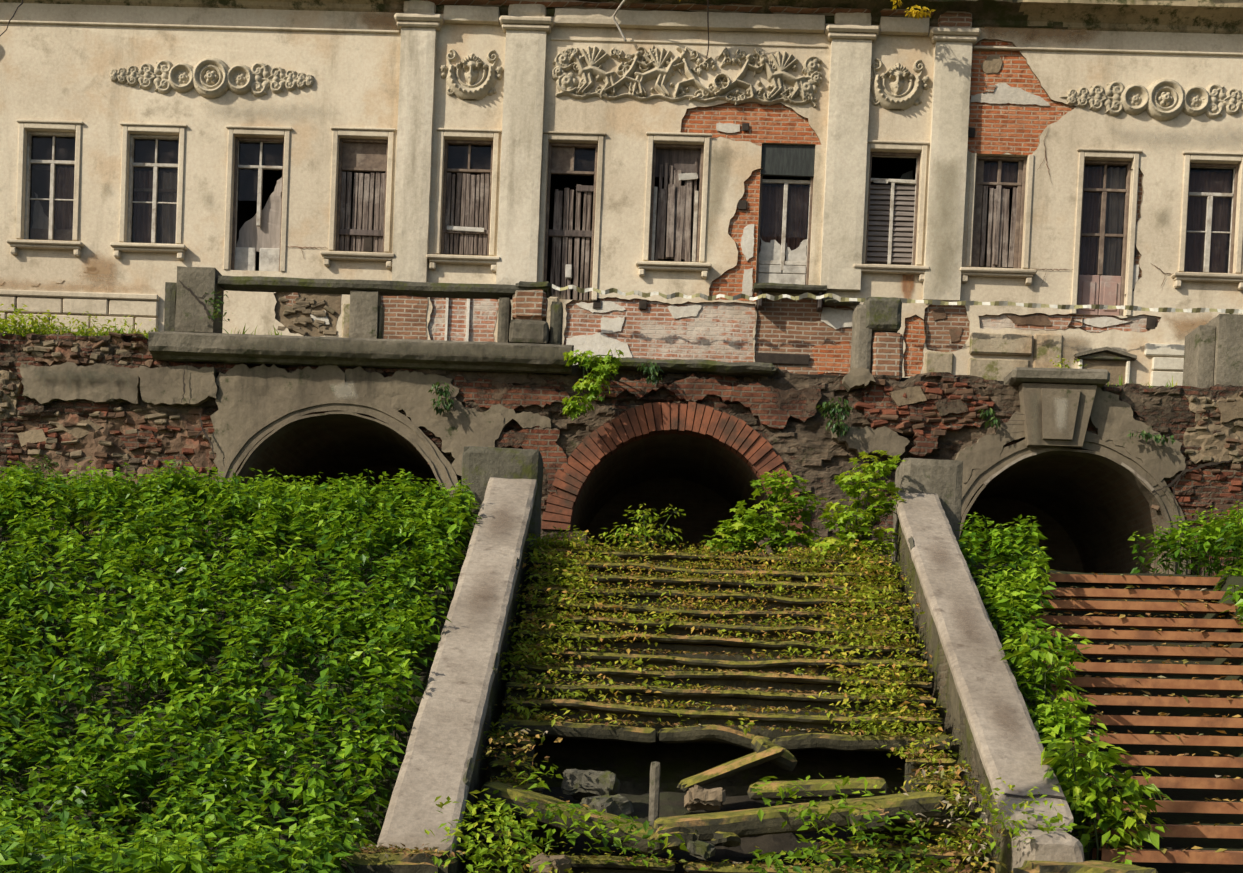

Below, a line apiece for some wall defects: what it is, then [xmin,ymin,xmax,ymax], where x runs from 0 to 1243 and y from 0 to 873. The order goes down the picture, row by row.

spalling [680,101,821,146]
spalling [968,38,1076,156]
spalling [274,292,342,337]
spalling [563,168,854,430]
spalling [453,374,570,410]
spalling [854,304,1161,458]
spalling [495,426,570,495]
spalling [1169,460,1243,529]